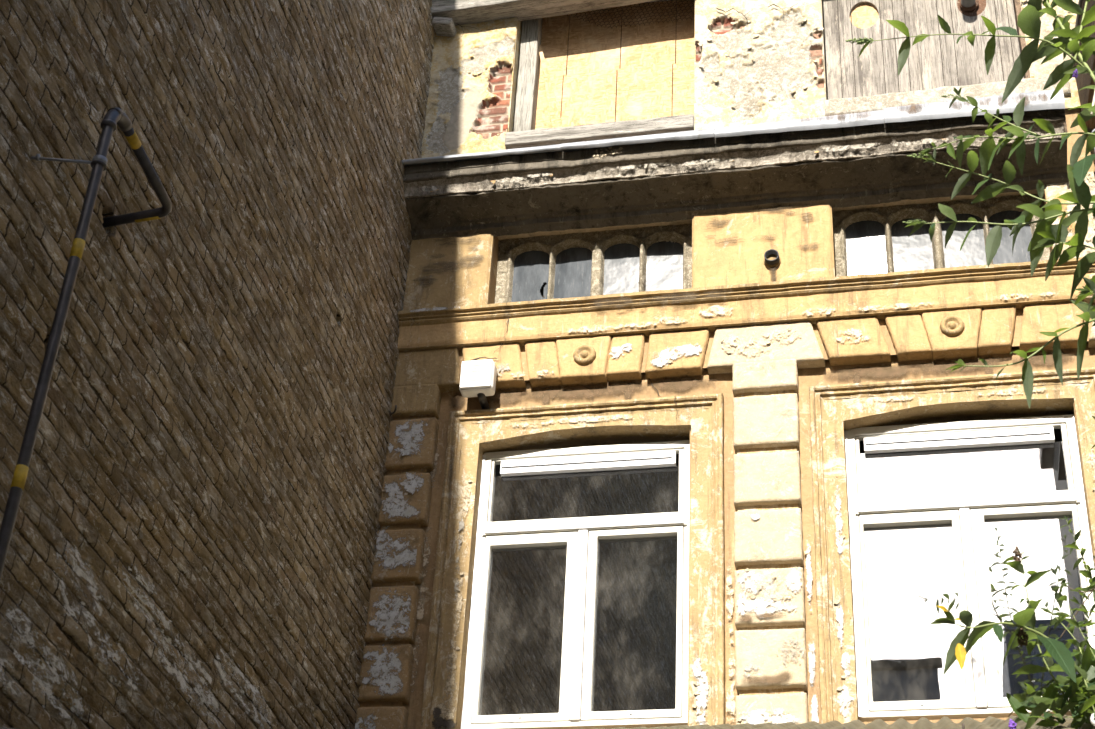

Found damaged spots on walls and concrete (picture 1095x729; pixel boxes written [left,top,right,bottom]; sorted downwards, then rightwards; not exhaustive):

peeling [425,36,515,155]
spalling [694,9,825,120]
peeling [651,343,702,367]
peeling [387,420,428,456]
peeling [362,449,439,697]
peeling [726,544,819,725]
peeling [692,657,709,725]